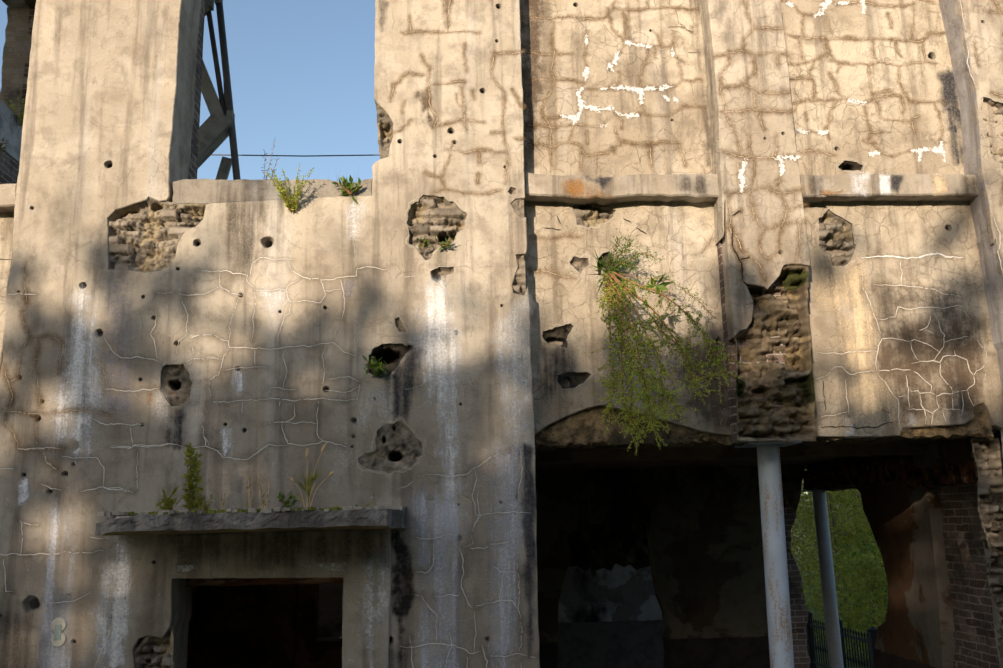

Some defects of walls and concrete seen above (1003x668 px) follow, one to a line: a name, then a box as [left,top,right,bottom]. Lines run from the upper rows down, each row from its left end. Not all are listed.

crack [390,0,1003,281]
spalling [978,95,1003,171]
spalling [108,198,207,273]
spalling [405,193,469,285]
spalling [814,207,858,269]
crack [0,215,413,615]
leakage [316,281,459,668]
spalling [356,416,427,477]
crack [397,425,536,668]
spalling [734,265,817,442]
crack [817,253,989,429]
spalling [134,626,174,668]